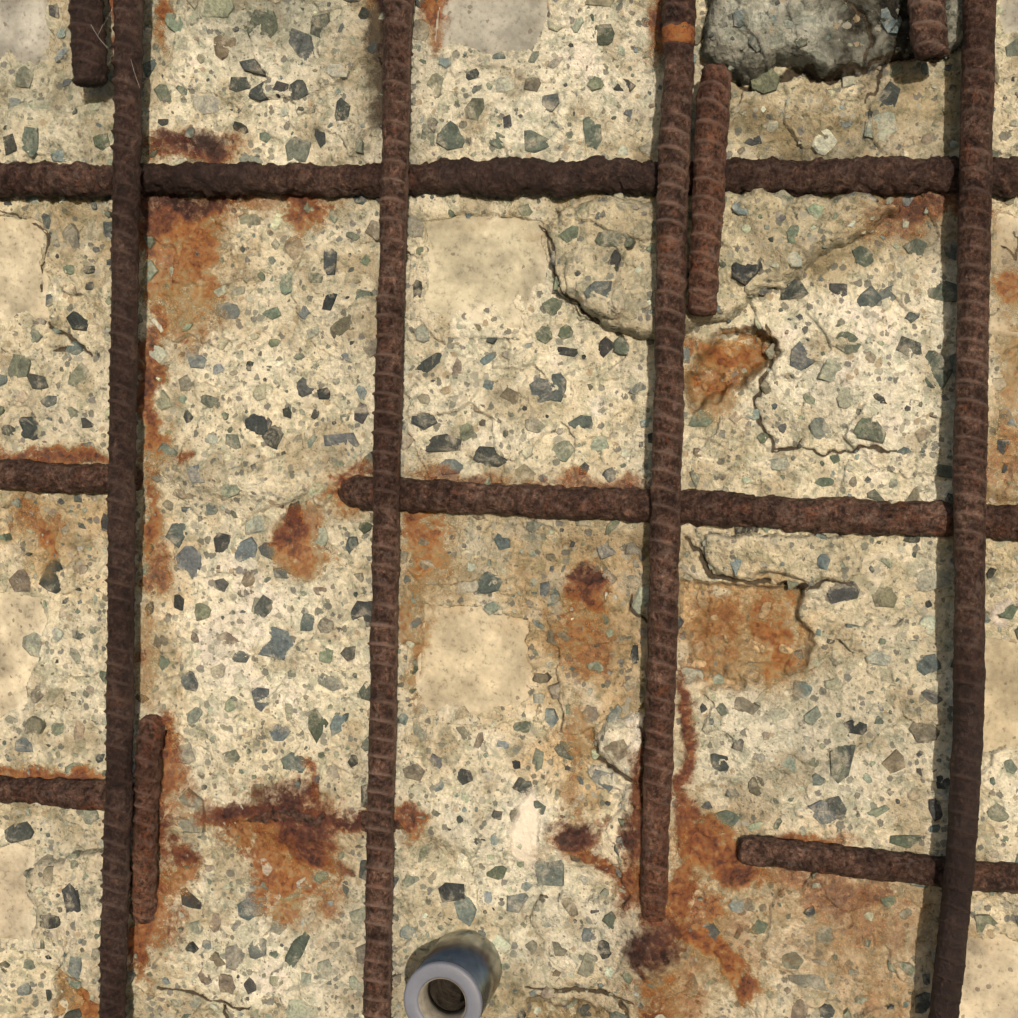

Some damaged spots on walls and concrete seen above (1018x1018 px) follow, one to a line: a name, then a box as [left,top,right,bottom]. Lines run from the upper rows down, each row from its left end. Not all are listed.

spalling [410,10,665,160]
corrosion [136,192,240,595]
spalling [138,194,380,420]
crack [539,225,600,325]
crack [752,324,897,457]
spalling [134,452,308,809]
crack [685,536,852,591]
corrosion [189,758,362,924]
spalling [419,512,647,1018]
corrosion [552,704,646,911]
crack [592,727,635,783]
corrosion [622,670,891,1018]